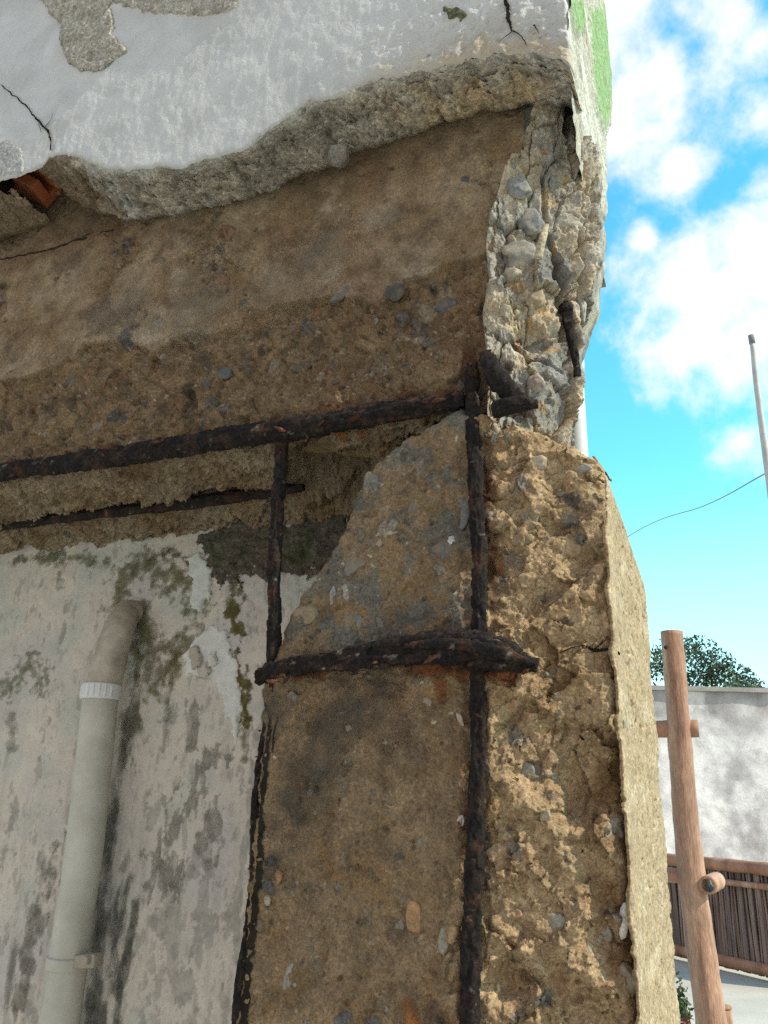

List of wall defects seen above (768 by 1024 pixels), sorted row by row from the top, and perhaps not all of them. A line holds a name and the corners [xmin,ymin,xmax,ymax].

peeling [41,0,239,72]
crack [500,0,539,45]
crack [2,85,53,150]
spalling [0,101,637,1024]
rust [265,627,535,703]
leakage [86,696,247,1024]
leakage [7,842,64,1016]